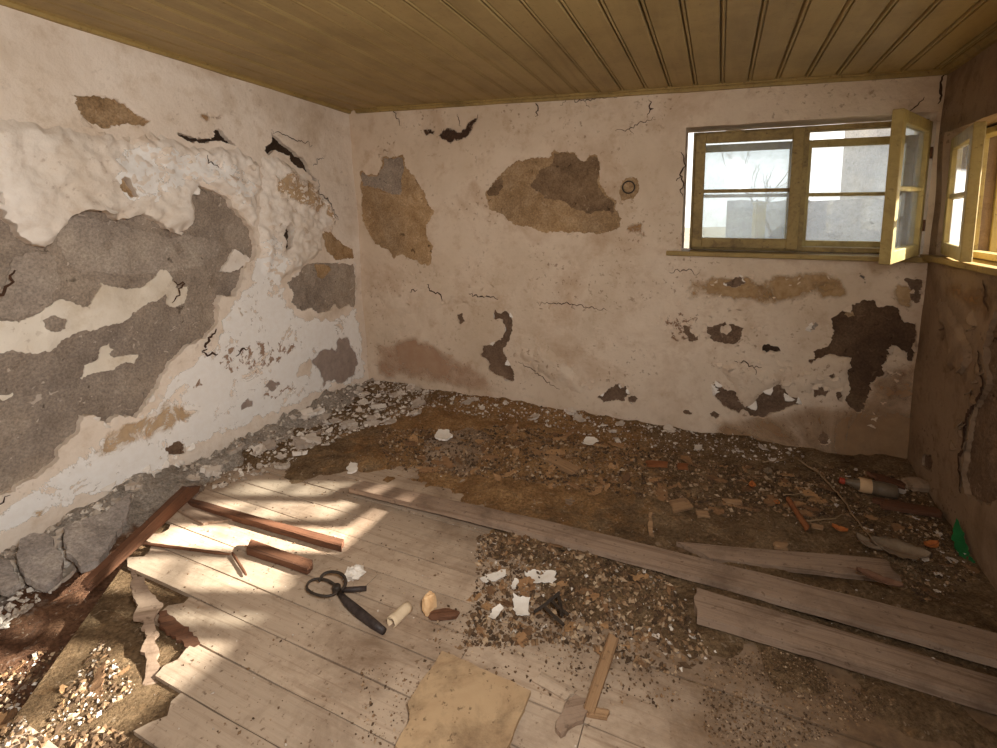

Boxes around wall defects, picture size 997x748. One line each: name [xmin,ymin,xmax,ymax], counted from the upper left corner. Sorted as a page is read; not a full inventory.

crack [265,131,338,217]
peeling [360,155,434,266]
peeling [485,150,639,235]
flaking render [268,222,357,313]
peeling [706,275,756,301]
flaking render [0,176,252,493]
flaking render [481,310,514,382]
flaking render [710,381,802,418]
flaking render [809,300,917,428]
flaking render [962,323,997,503]